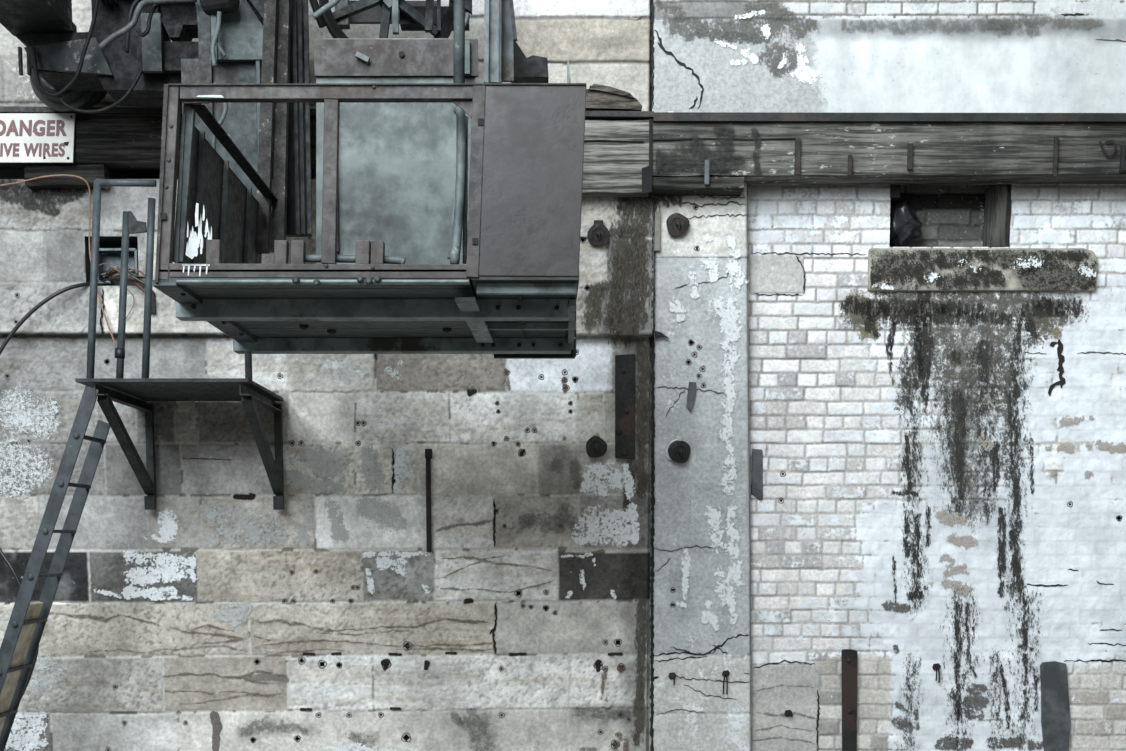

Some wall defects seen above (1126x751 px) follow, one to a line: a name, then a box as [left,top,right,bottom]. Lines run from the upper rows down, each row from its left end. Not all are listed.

crack [650,0,704,109]
peeling [734,10,771,40]
crack [584,136,795,144]
crack [751,252,865,296]
water stain [1010,256,1044,273]
water stain [581,194,682,510]
flaking render [93,508,198,601]
flaking render [561,458,640,598]
peeling [668,235,749,632]
crack [649,195,820,751]
water stain [836,272,1089,751]
water stain [576,597,649,746]